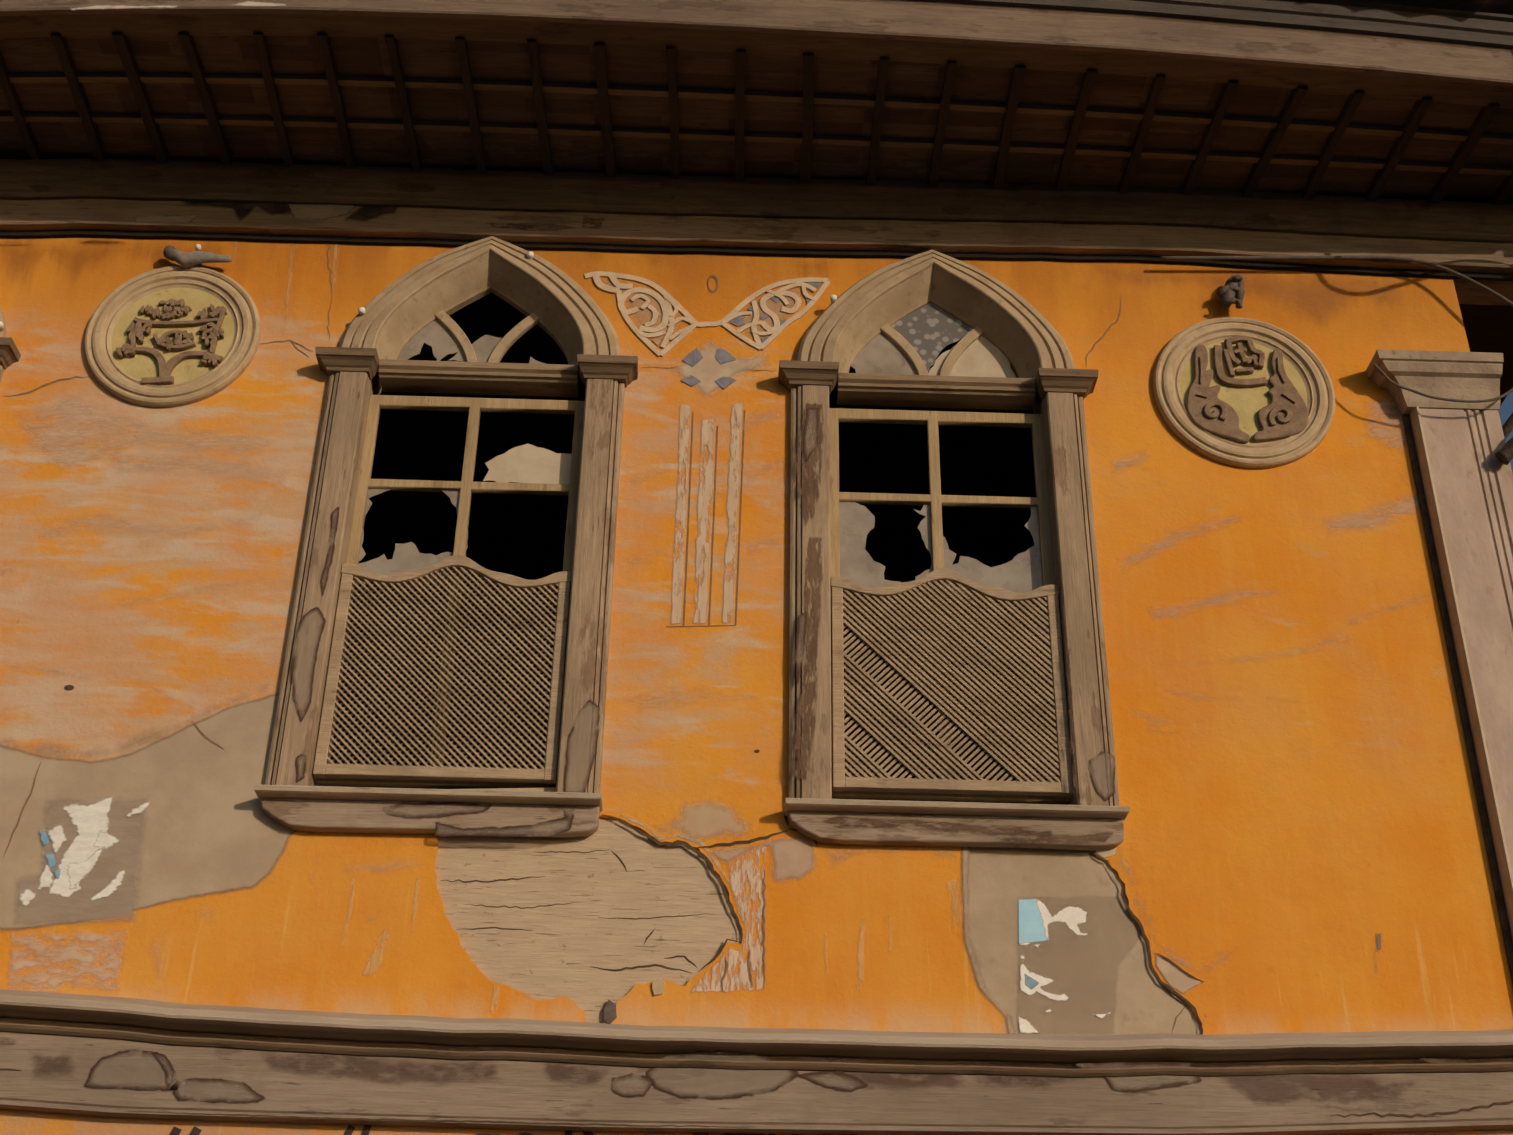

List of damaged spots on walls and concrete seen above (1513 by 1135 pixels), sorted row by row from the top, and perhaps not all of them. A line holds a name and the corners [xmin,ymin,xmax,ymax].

crack [261,243,332,356]
crack [1086,300,1121,366]
crack [7,376,87,397]
crack [3,763,41,857]
flaking render [383,700,766,1024]
flaking render [825,816,1204,1036]
peeling [84,1049,265,1104]
peeling [612,1050,867,1100]